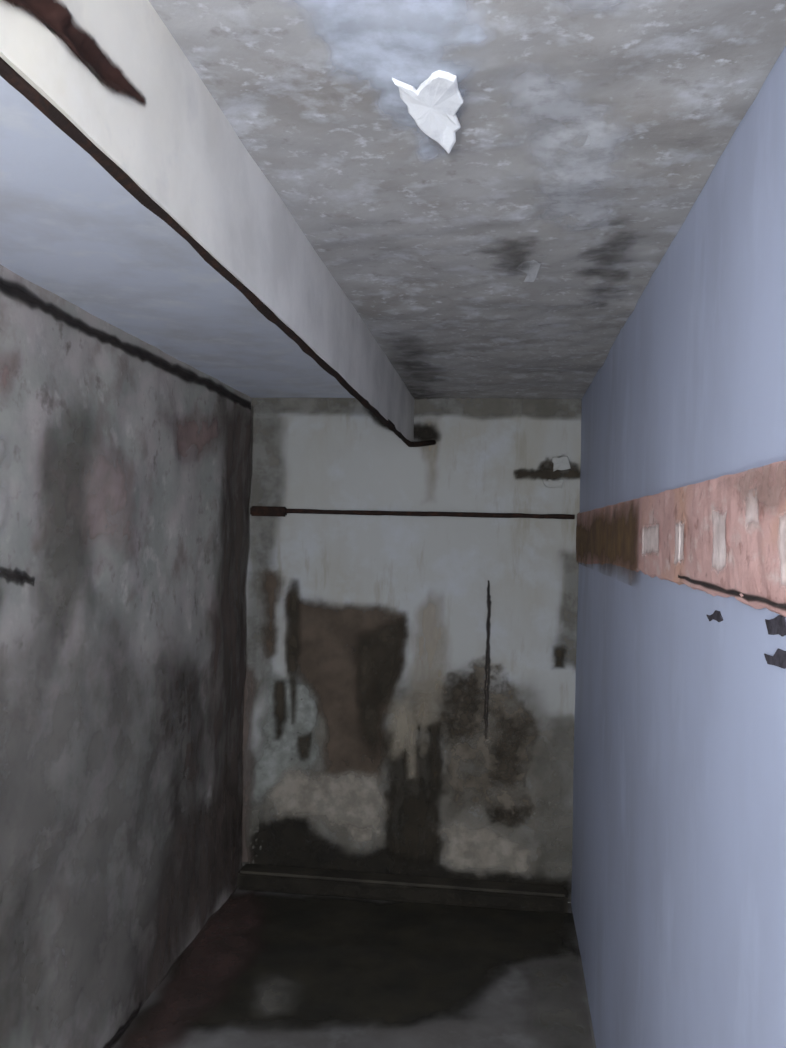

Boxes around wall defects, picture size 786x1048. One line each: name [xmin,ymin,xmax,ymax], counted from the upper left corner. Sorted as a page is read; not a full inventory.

peeling [300,0,483,156]
water stain [399,352,582,426]
crack [0,568,35,585]
spalling [514,456,580,488]
spalling [576,460,786,636]
water stain [0,395,579,1048]
crack [483,580,491,739]
peeling [764,649,786,669]